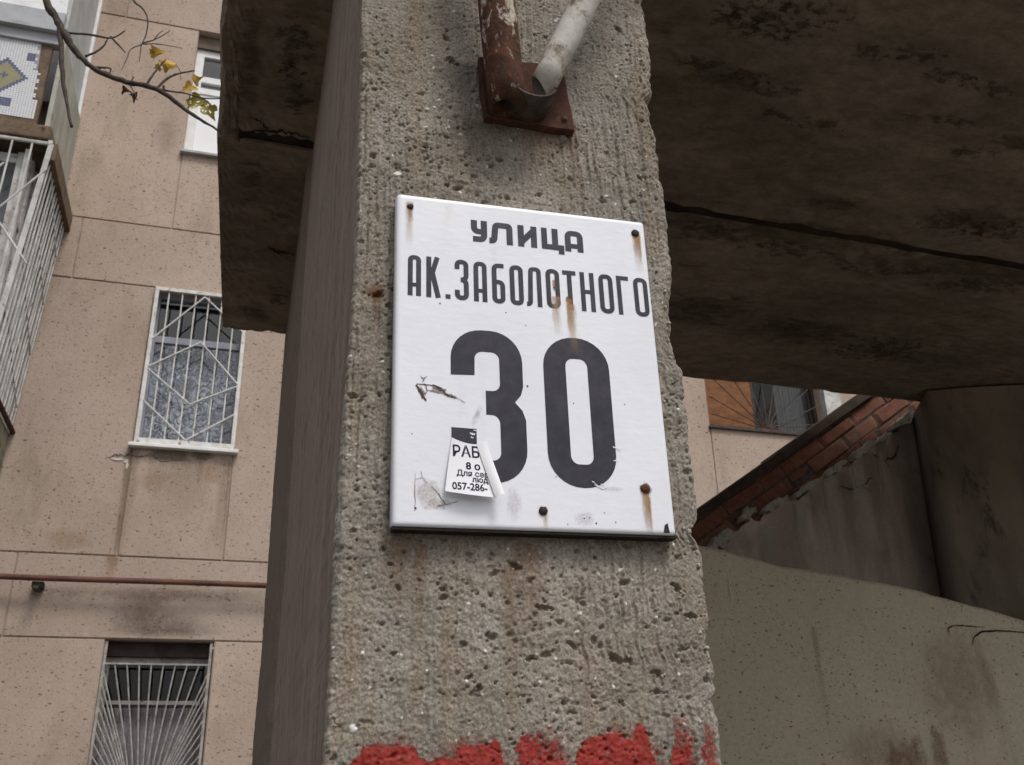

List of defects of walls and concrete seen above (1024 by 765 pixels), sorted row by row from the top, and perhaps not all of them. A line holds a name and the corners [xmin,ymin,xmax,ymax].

corrosion [552,280,575,325]
spalling [680,411,915,569]
crack [948,625,1024,644]